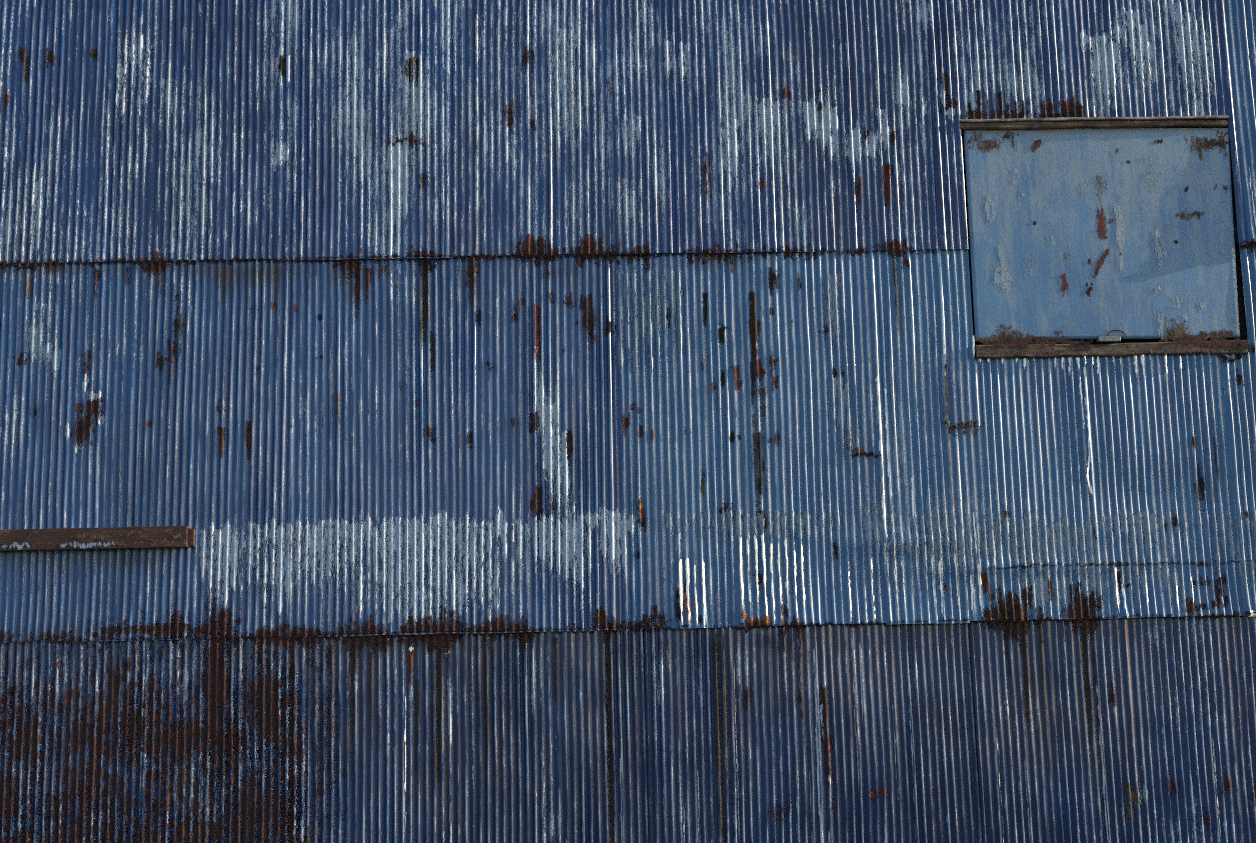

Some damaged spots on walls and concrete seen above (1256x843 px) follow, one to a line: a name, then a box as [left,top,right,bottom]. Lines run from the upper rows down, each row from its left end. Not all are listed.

rust [1184,129,1229,161]
rust [1061,252,1071,297]
rust [1086,173,1122,297]
rust [0,233,942,537]
rust [974,324,1093,356]
rust [1134,309,1256,385]
peeling [60,386,637,624]
rust [0,562,1256,843]